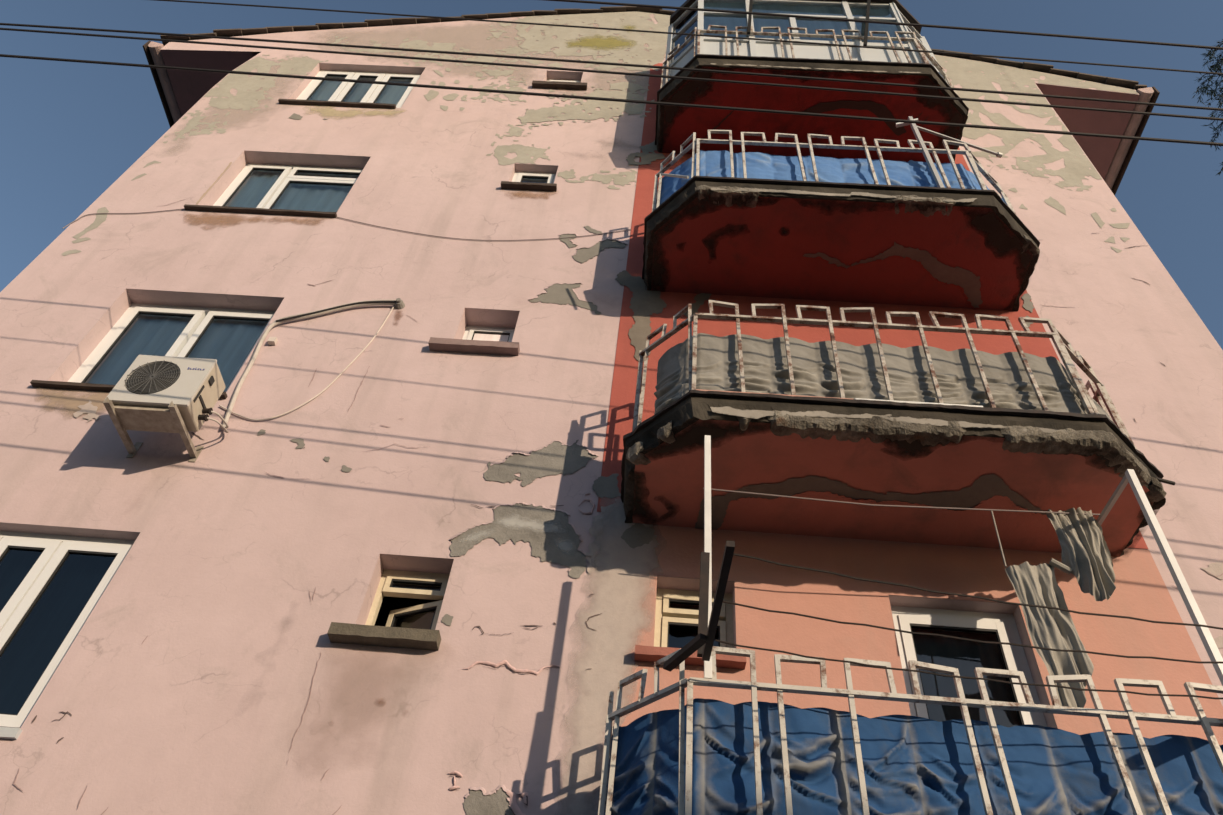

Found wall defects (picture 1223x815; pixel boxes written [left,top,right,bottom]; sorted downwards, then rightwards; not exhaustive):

peeling [163,55,329,143]
peeling [326,11,671,165]
spalling [710,63,921,73]
peeling [934,55,1138,215]
peeling [557,140,666,189]
spalling [695,185,977,217]
peeling [528,282,602,315]
spalling [484,439,599,486]
spalling [626,406,1167,502]
spalling [694,474,1046,530]
spalling [449,502,587,578]
spalling [463,785,517,815]